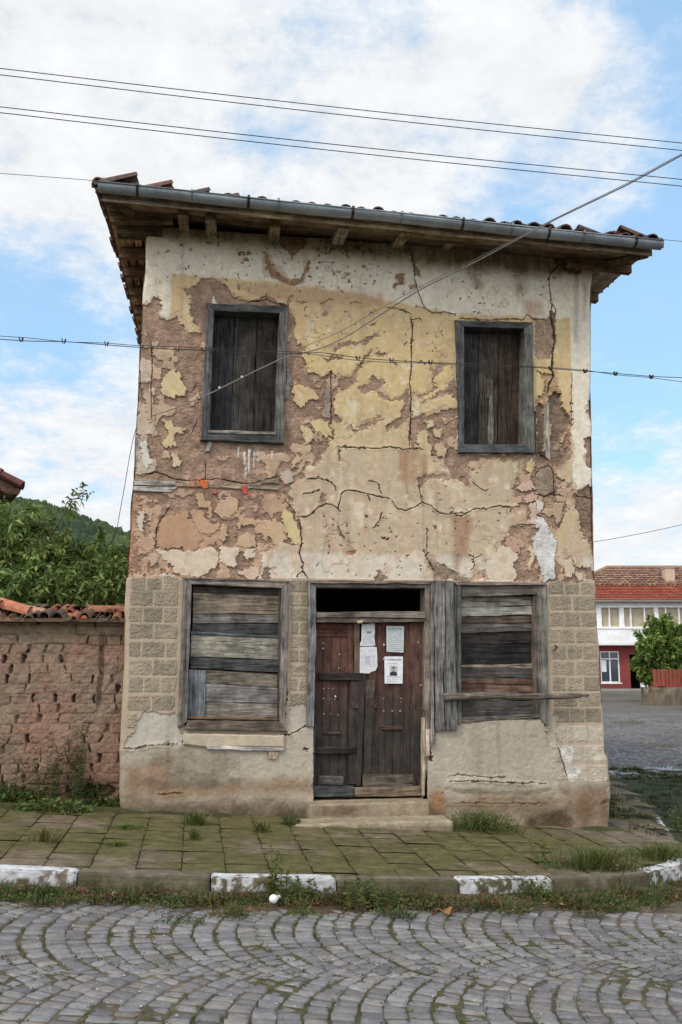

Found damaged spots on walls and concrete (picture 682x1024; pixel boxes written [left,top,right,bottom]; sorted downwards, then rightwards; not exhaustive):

flaking render [127,235,594,584]
crack [330,249,574,451]
crack [144,463,591,578]
flaking render [559,744,582,778]